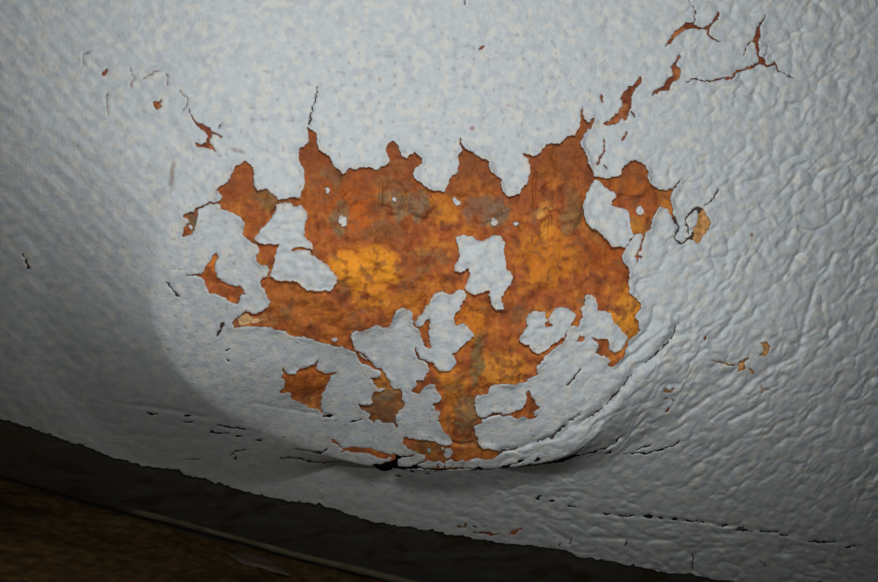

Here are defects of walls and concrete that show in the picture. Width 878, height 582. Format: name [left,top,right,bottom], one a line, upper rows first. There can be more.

peeling [182,109,719,469]
peeling [713,342,770,374]
crack [371,325,676,477]
crack [184,414,262,460]
crack [280,448,341,464]
crack [602,513,856,548]